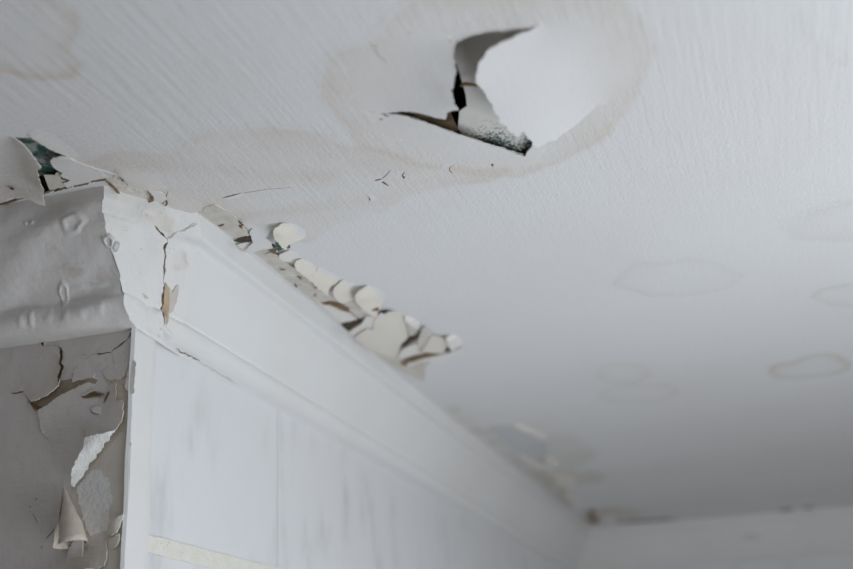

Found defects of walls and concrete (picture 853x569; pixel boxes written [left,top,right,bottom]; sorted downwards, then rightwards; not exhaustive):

water stain [0,0,92,85]
water stain [58,0,663,246]
spalling [451,55,467,135]
crack [126,207,200,330]
peeling [0,128,463,382]
crack [11,332,131,446]
crack [176,348,238,385]
water stain [762,352,853,381]
peeling [33,357,137,569]